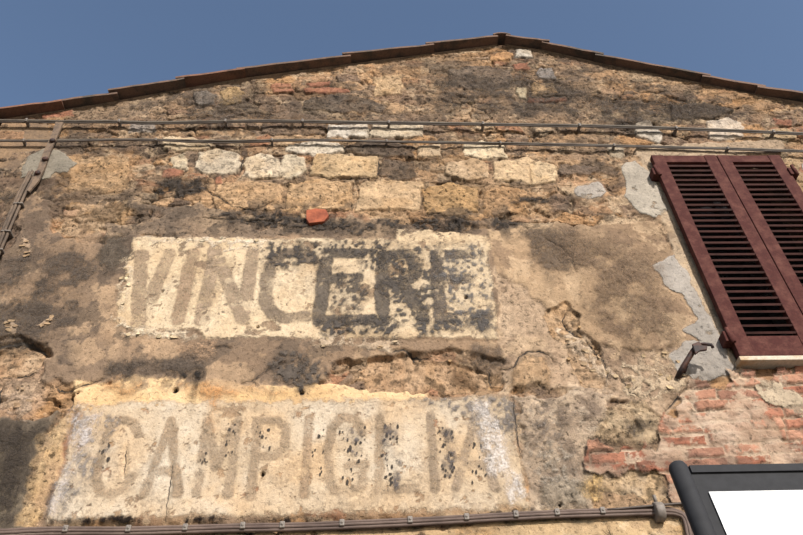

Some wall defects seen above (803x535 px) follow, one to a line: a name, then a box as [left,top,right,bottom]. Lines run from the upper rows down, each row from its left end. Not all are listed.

peeling [4,319,18,336]
spalling [0,345,51,421]
leakage [0,234,132,352]
leakage [104,353,205,387]
leakage [209,209,520,339]
spalling [312,332,491,398]
leakage [527,227,676,348]
crack [562,316,641,398]
spalling [543,300,803,503]
leakage [0,418,49,524]
mould [67,515,141,524]